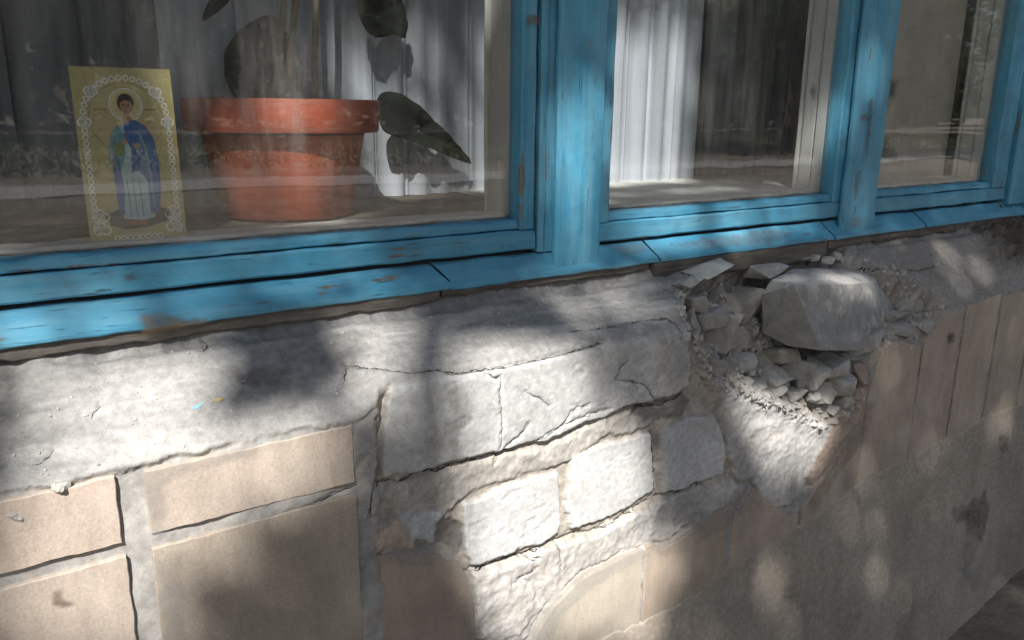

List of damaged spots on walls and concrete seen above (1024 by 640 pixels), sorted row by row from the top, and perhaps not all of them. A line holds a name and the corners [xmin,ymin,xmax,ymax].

crack [315,318,710,583]
spalling [376,246,945,640]